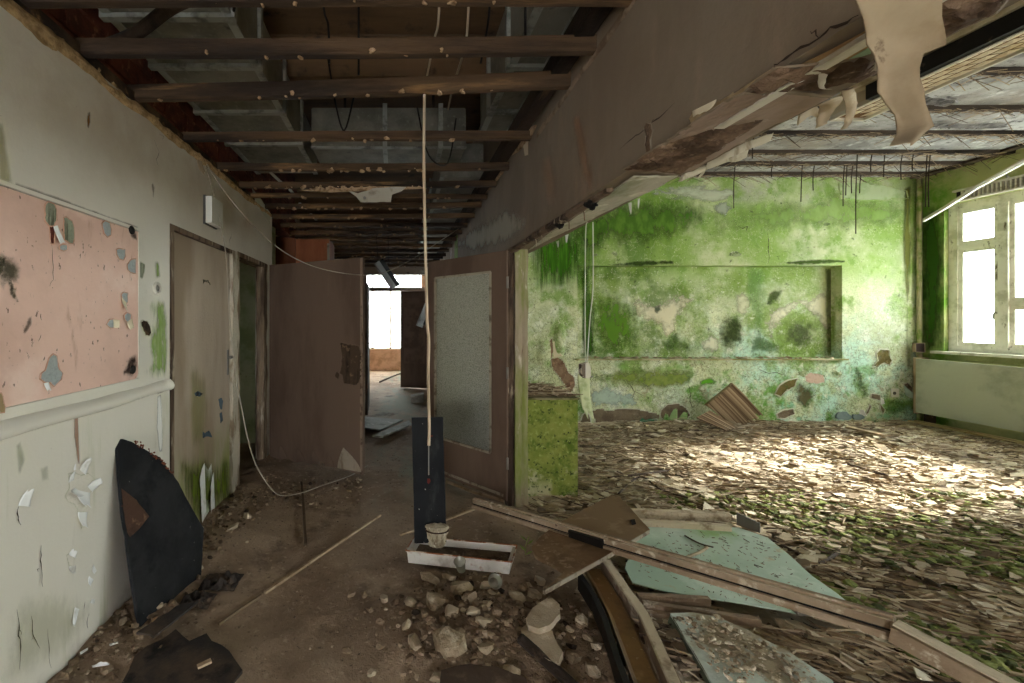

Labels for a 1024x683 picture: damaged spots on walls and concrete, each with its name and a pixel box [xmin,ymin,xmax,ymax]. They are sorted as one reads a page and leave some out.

spalling [942,0,1009,37]
spalling [0,0,272,224]
spalling [532,54,877,249]
efflorescence [655,185,733,215]
spalling [838,181,909,202]
spalling [44,201,75,252]
leakage [581,269,689,355]
leakage [704,294,750,350]
mould [753,336,777,350]
leakage [767,291,828,346]
spalling [872,348,893,368]
spalling [774,370,843,419]